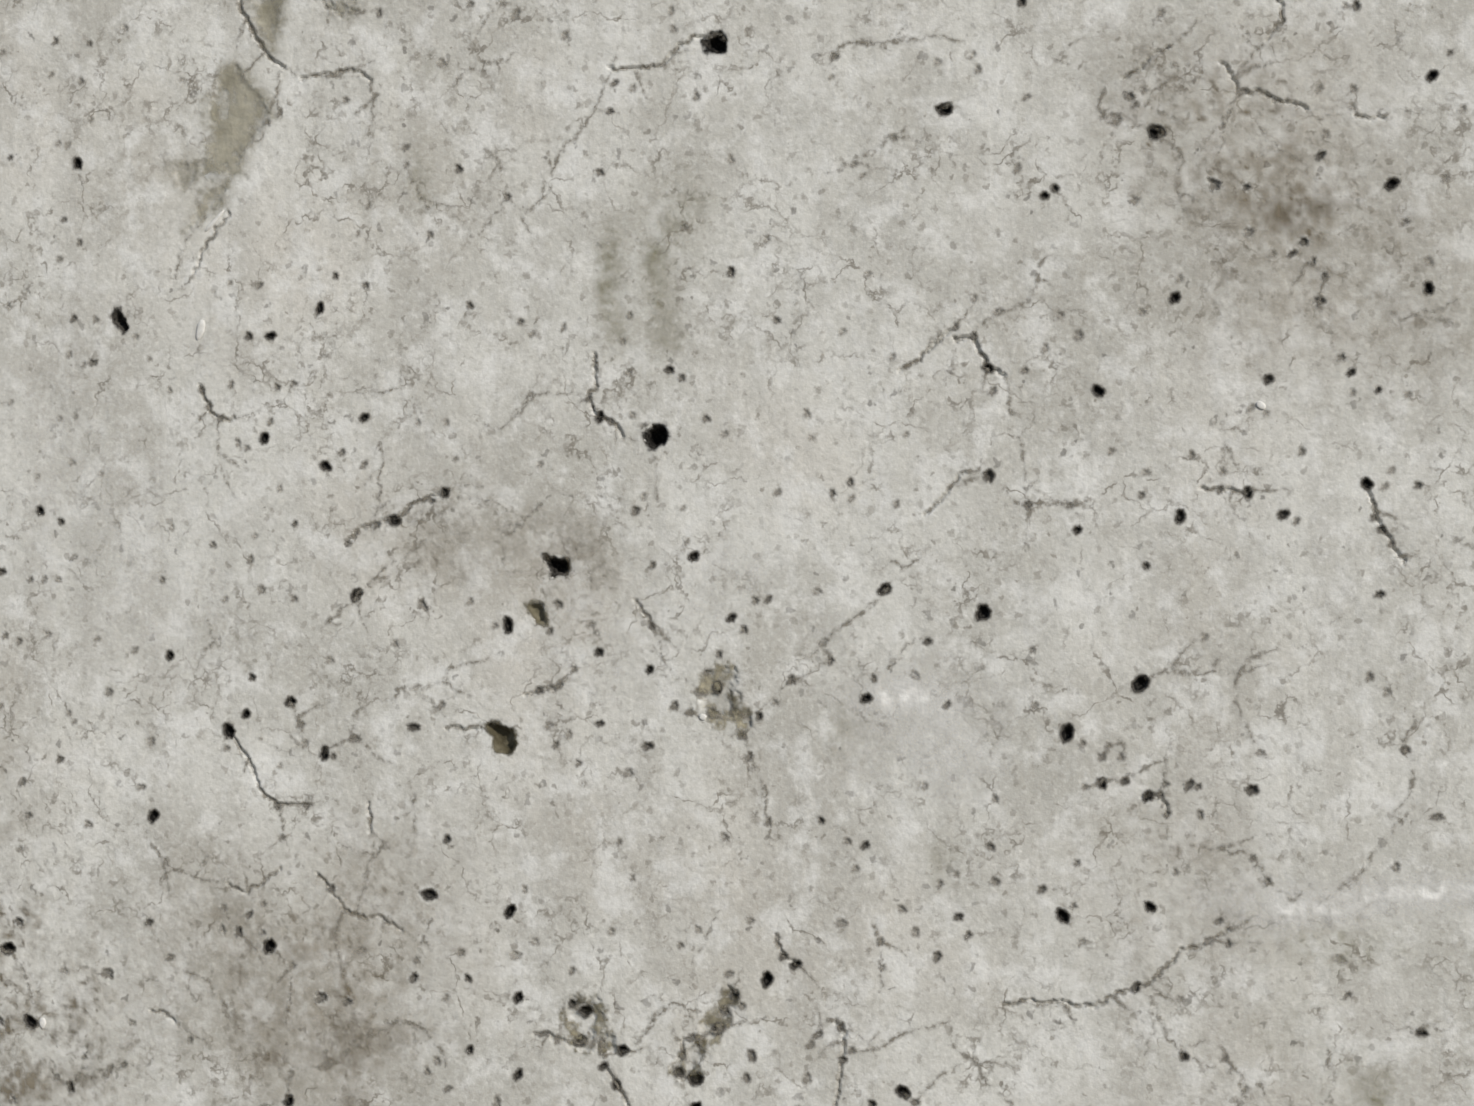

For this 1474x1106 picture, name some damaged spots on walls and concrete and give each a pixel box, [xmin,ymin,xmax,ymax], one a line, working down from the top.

crack [238,3,375,142]
crack [490,35,712,231]
crack [903,257,1087,516]
crack [327,442,459,625]
crack [1002,920,1265,1095]